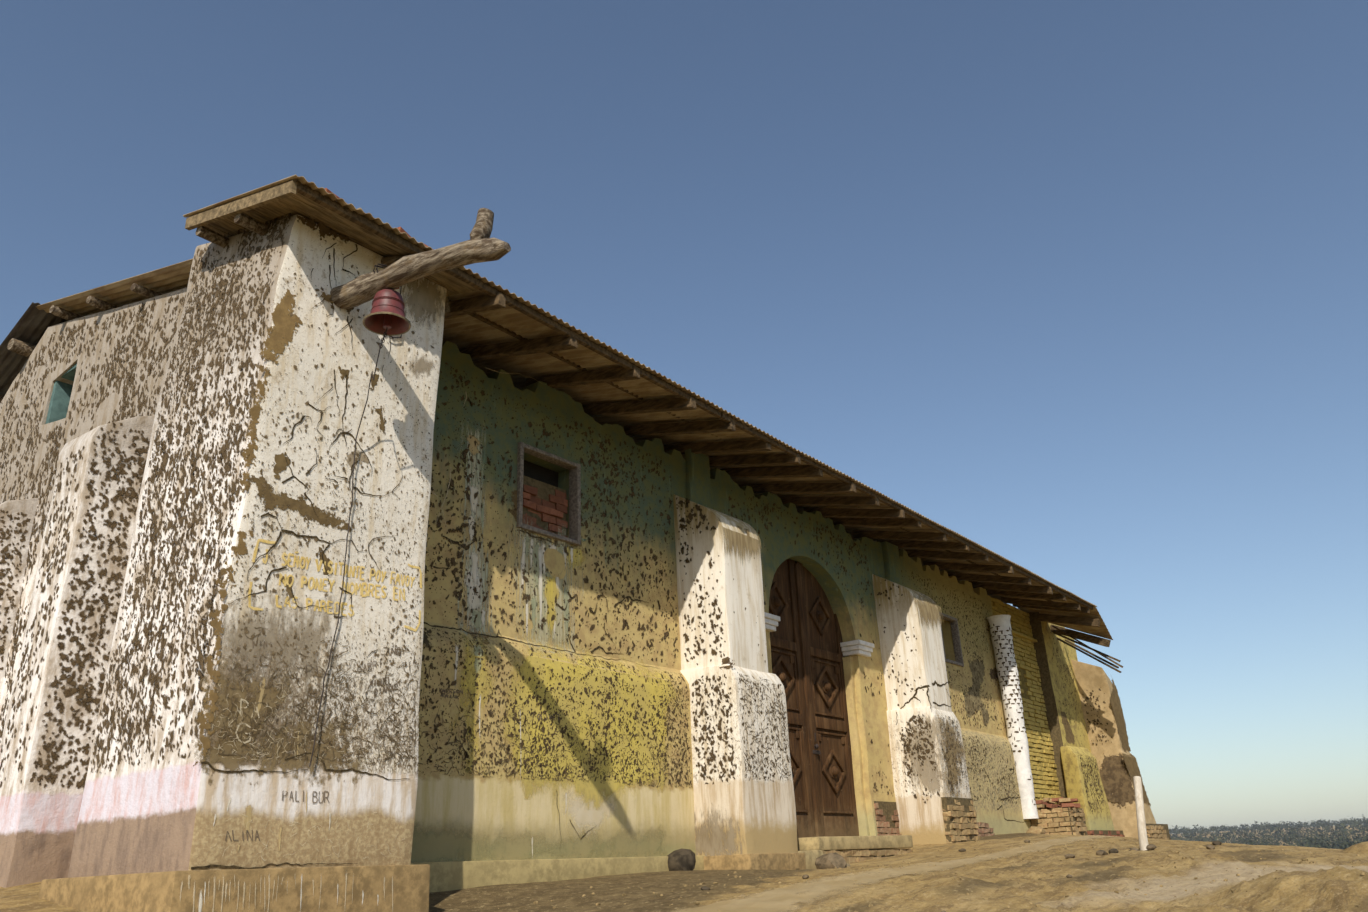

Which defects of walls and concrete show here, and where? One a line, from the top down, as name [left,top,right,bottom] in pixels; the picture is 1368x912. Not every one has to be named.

flaking render [0,213,789,789]
crack [230,243,655,668]
damp [454,428,493,681]
damp [515,528,580,662]
crack [896,680,953,725]
damp [180,874,393,912]